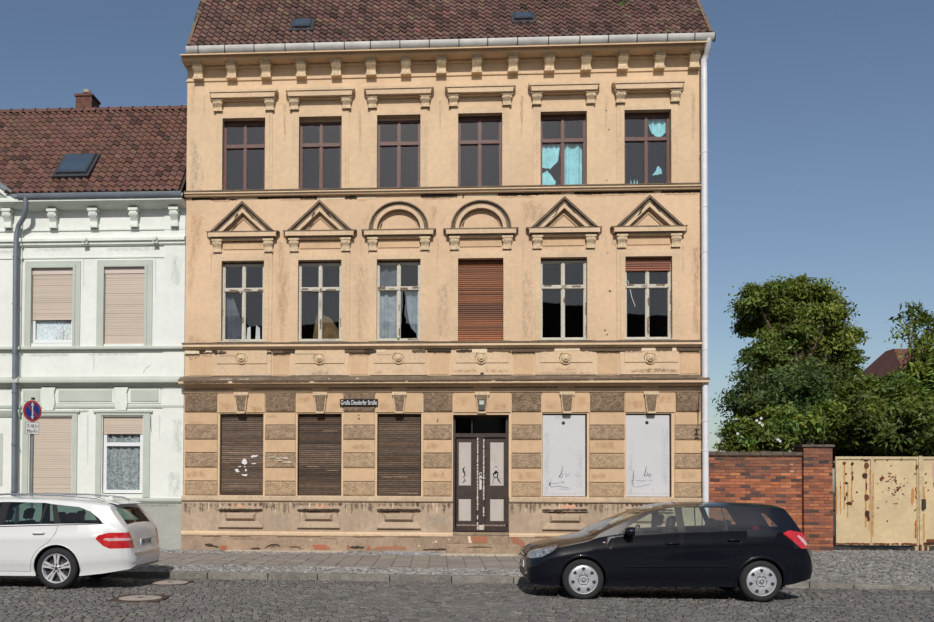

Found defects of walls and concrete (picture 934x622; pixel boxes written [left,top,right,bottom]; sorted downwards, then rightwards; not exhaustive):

corrosion [835,459,934,545]